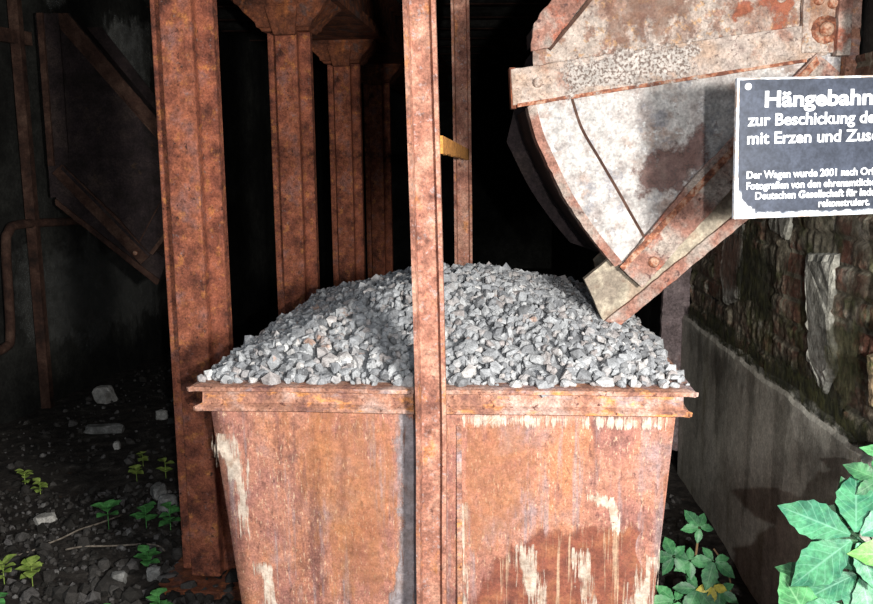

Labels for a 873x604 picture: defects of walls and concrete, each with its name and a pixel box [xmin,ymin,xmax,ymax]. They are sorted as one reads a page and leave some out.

flaking render [855,51,873,75]
flaking render [687,214,873,452]